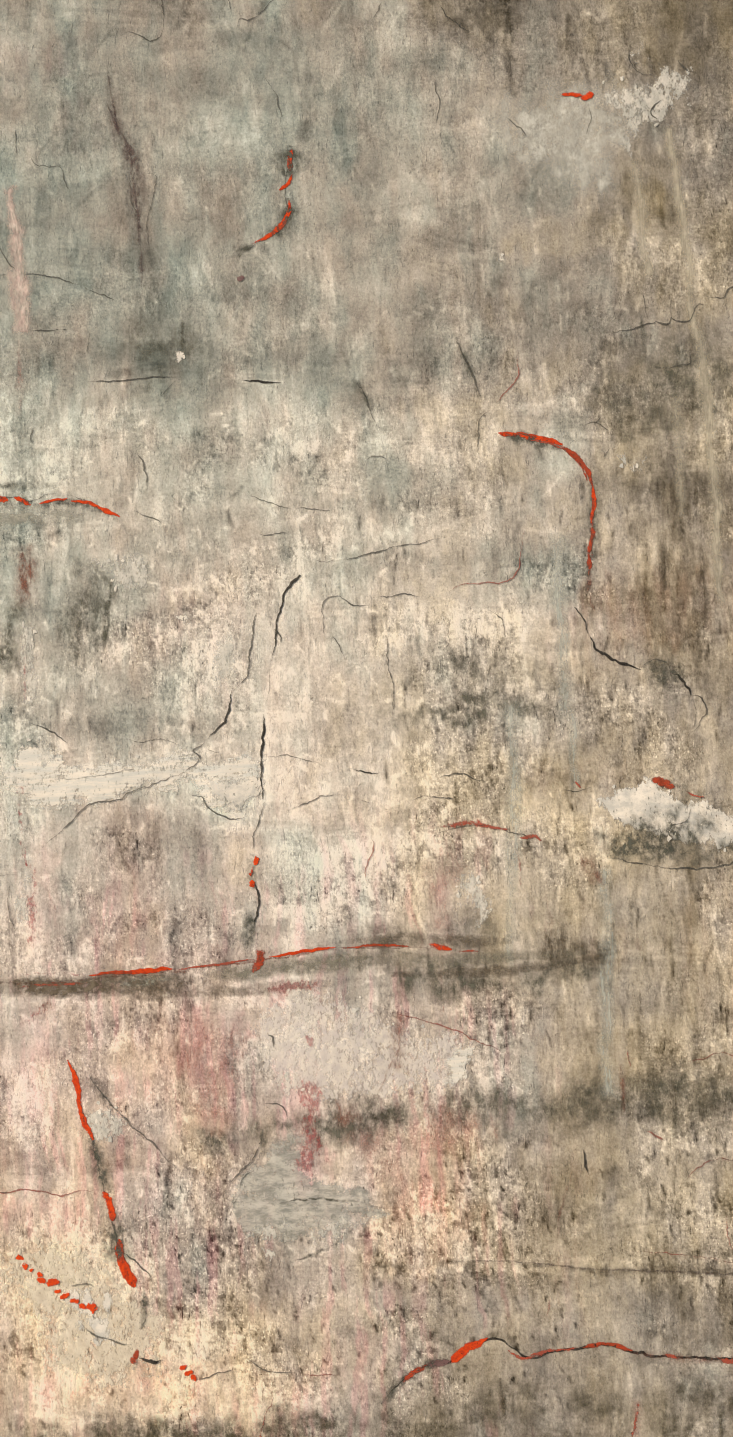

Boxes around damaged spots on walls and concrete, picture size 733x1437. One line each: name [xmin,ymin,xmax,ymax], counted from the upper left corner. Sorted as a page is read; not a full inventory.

crack [241,96,300,251]
crack [0,455,160,522]
crack [460,348,707,729]
crack [12,540,541,997]
peeling [596,777,733,861]
crack [0,1060,166,1364]
crack [202,1362,332,1431]
crack [389,1333,733,1395]